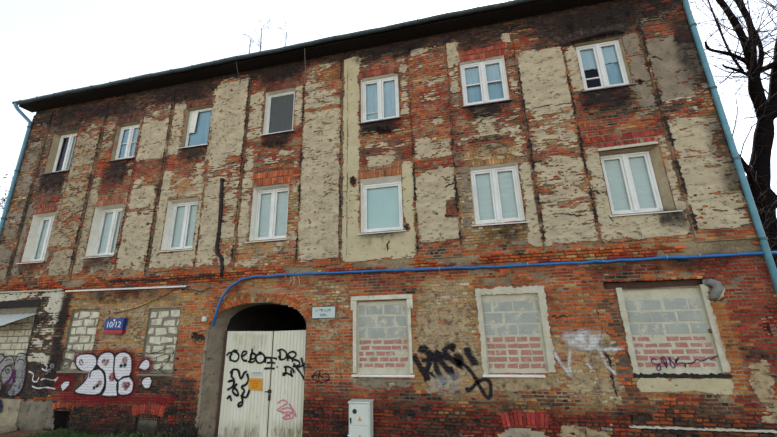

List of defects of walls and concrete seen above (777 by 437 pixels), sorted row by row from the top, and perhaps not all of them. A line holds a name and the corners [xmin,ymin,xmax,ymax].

leakage [673,19,708,82]
peeling [0,33,751,282]
peeling [0,291,65,364]
spalling [188,331,209,343]
peeling [312,281,347,350]
peeling [747,359,777,423]
peeling [559,423,614,437]